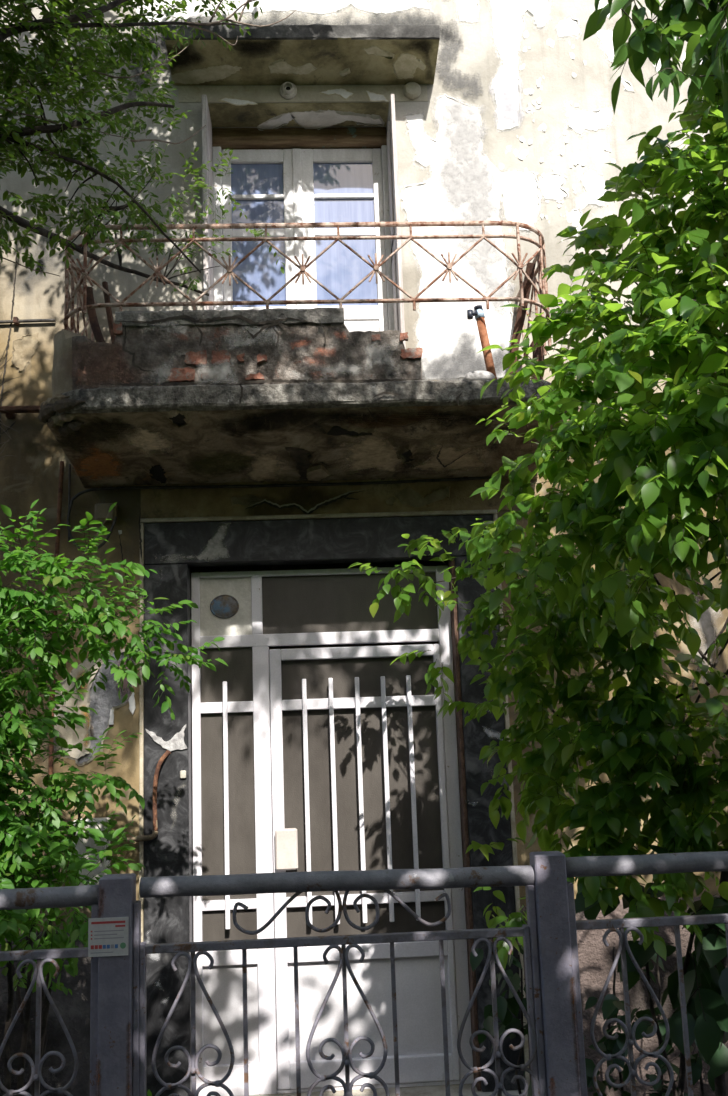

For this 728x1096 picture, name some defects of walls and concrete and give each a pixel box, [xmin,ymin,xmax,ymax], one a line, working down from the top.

peeling [133,0,614,383]
water stain [235,12,521,314]
water stain [422,333,508,381]
water stain [16,420,170,453]
water stain [243,451,281,481]
water stain [221,409,488,472]
crack [246,489,363,514]
flaking render [53,649,136,766]